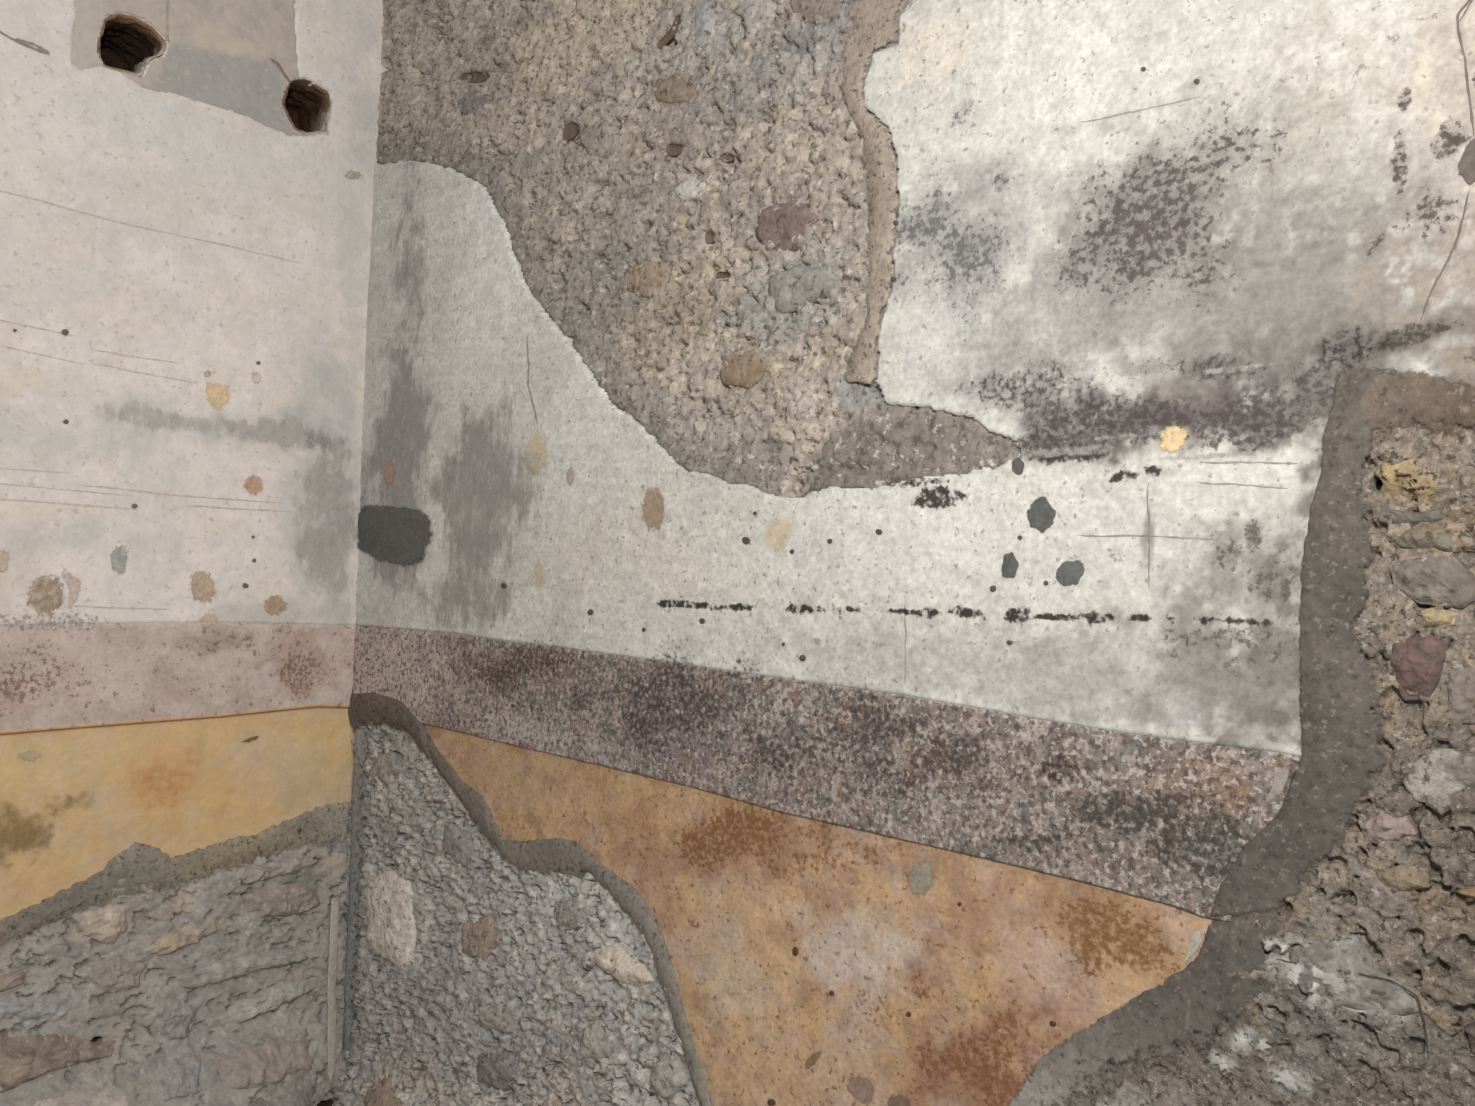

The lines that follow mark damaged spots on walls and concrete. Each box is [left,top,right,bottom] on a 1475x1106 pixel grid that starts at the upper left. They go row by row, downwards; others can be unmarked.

flaking render [71,0,308,137]
flaking render [376,0,1021,498]
leakage [892,190,1009,340]
leakage [1058,101,1287,307]
crack [1420,189,1470,321]
leakage [1431,121,1470,159]
crack [1456,0,1474,134]
leakage [971,338,1364,482]
leakage [227,349,531,624]
leakage [891,477,966,509]
flaking render [1009,367,1475,1106]
flaking render [0,692,713,1106]